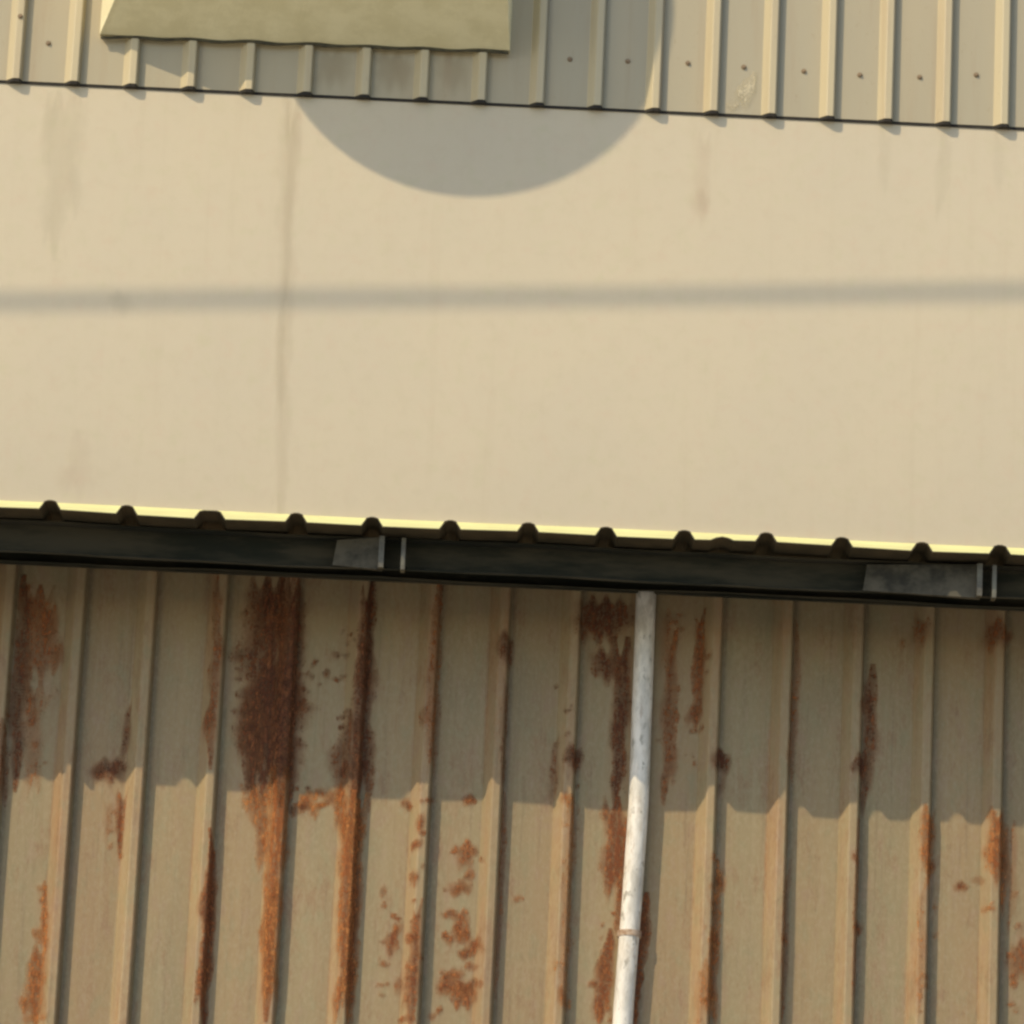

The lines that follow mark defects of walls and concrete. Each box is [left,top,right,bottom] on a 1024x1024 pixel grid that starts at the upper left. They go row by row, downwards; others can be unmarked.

rust [0,574,34,799]
rust [95,708,131,858]
rust [241,581,377,1024]
rust [576,595,635,1023]
rust [660,608,711,802]
rust [852,666,878,822]
rust [19,881,49,1024]
rust [193,827,218,1024]
rust [378,890,423,1022]
rust [430,908,482,1019]